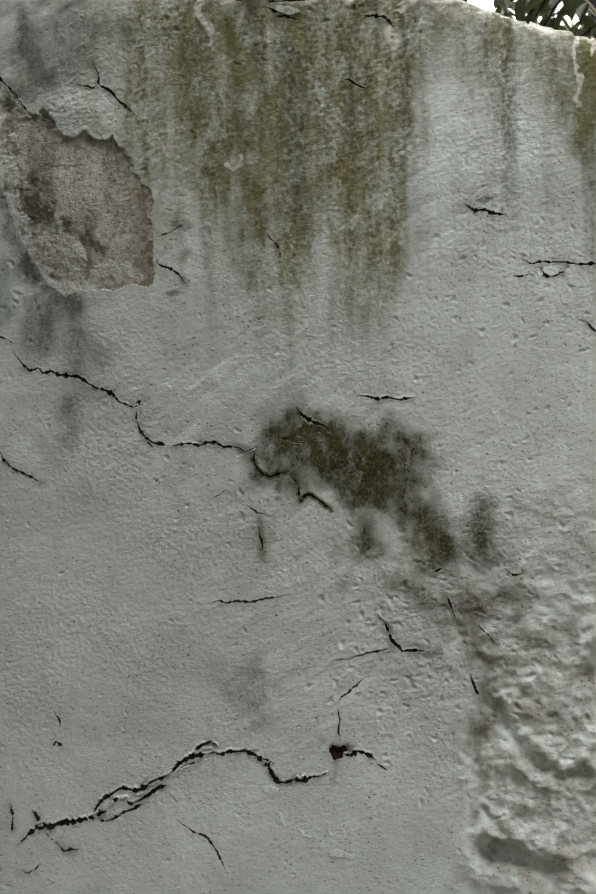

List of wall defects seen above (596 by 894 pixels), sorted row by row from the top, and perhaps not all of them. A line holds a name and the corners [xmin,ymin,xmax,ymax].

crack [76,62,138,117]
leakage [193,0,252,139]
peeling [274,5,301,15]
leakage [383,25,402,52]
leakage [523,23,557,40]
leakage [570,37,596,107]
flaking render [0,83,155,296]
crack [464,203,506,218]
crack [513,258,596,281]
crack [0,334,335,513]
leakage [316,425,394,554]
crack [8,610,429,870]